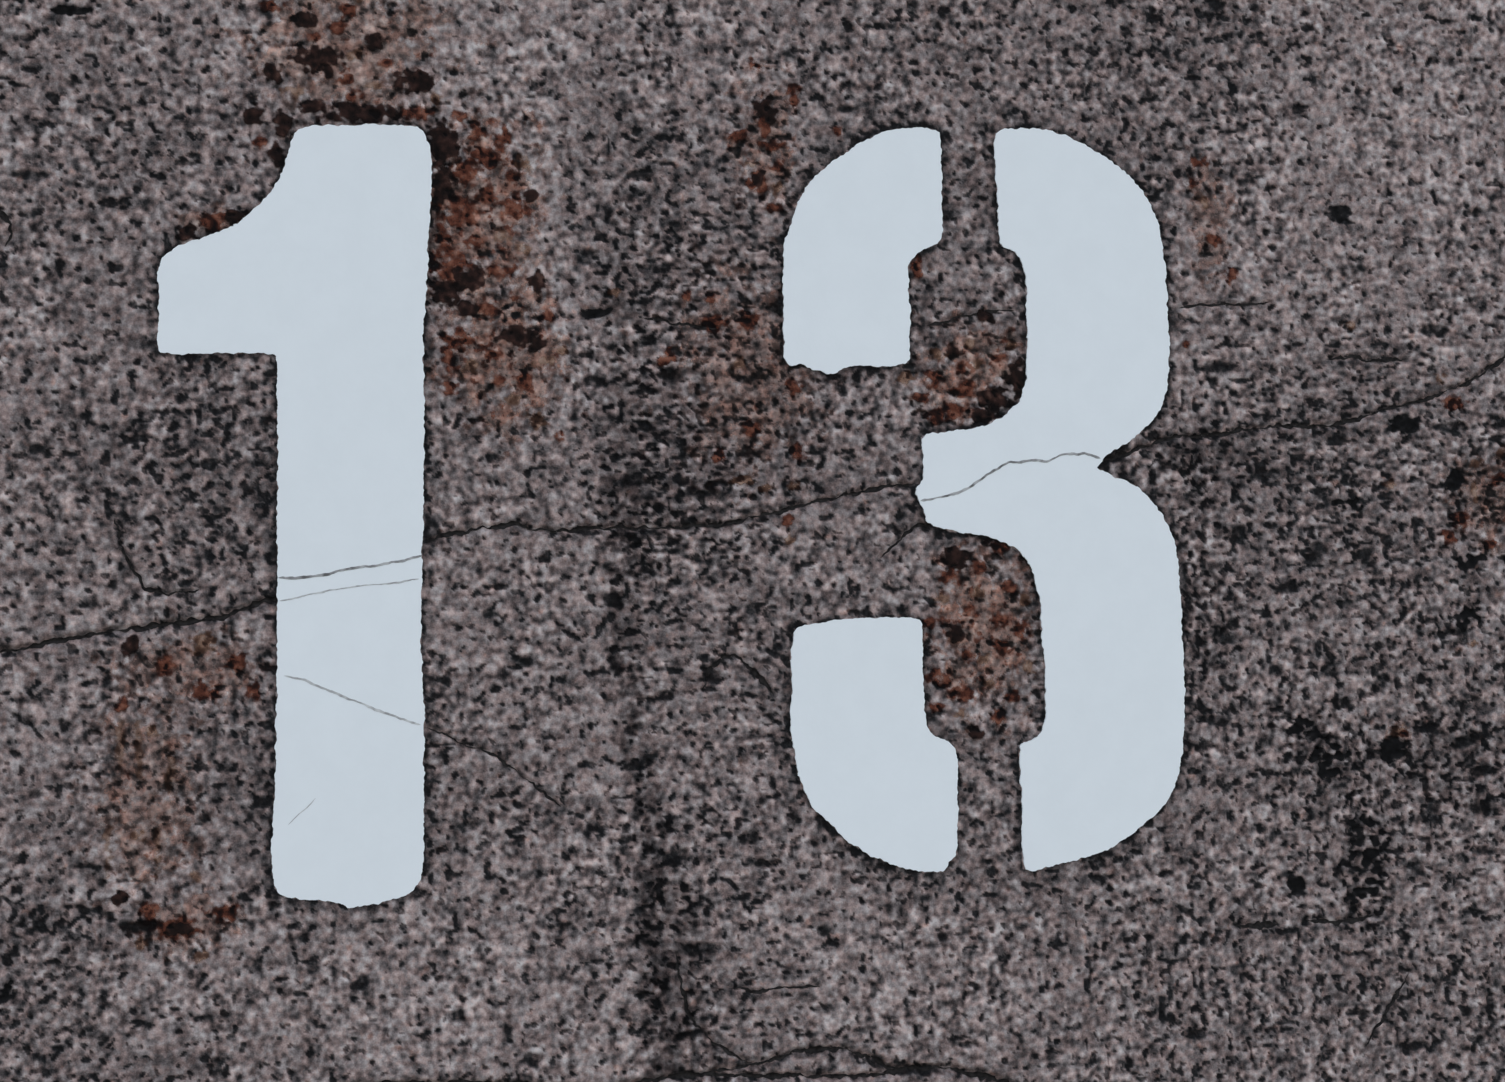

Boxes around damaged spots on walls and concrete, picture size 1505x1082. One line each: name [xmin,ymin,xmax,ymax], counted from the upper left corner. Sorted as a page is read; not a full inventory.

rust [175,202,248,241]
rust [222,0,572,455]
rust [910,253,923,279]
rust [898,309,1027,427]
crack [1329,354,1405,363]
crack [0,356,1505,653]
rust [921,534,1041,739]
crack [636,954,1009,1082]
crack [381,1074,529,1082]